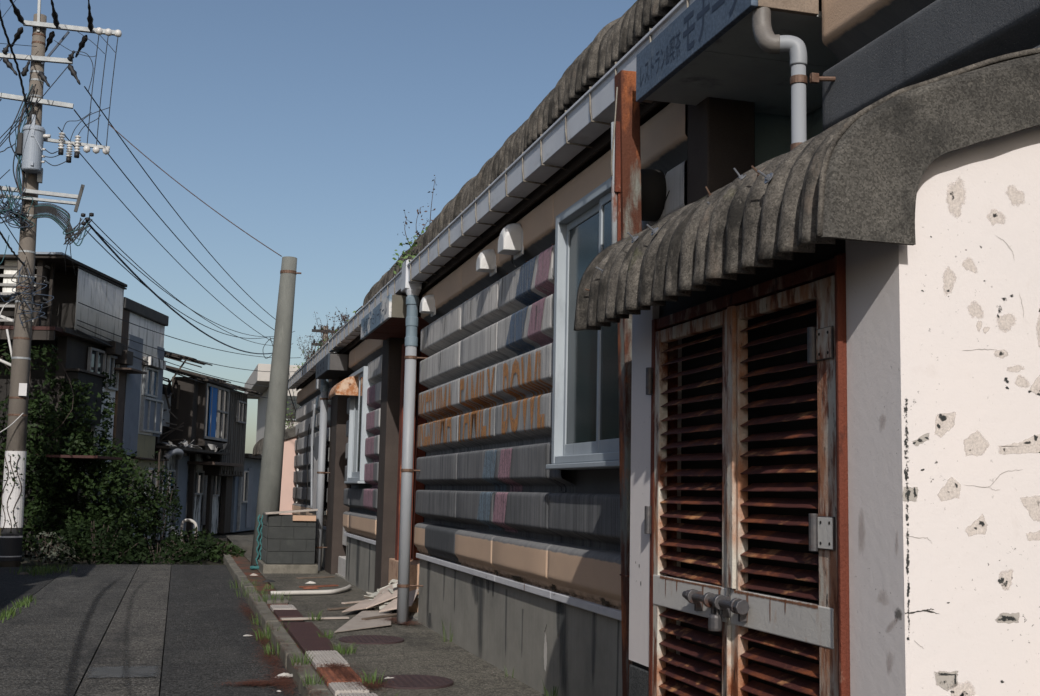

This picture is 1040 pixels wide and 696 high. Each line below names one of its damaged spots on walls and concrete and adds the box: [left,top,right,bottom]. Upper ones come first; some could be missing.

peeling [995,350,1040,396]
peeling [912,412,956,446]
peeling [964,431,1040,456]
peeling [938,477,961,501]
peeling [966,514,987,536]
peeling [1021,496,1040,541]
peeling [998,570,1013,589]
crack [905,607,939,615]
peeling [996,613,1019,624]
peeling [935,671,974,696]